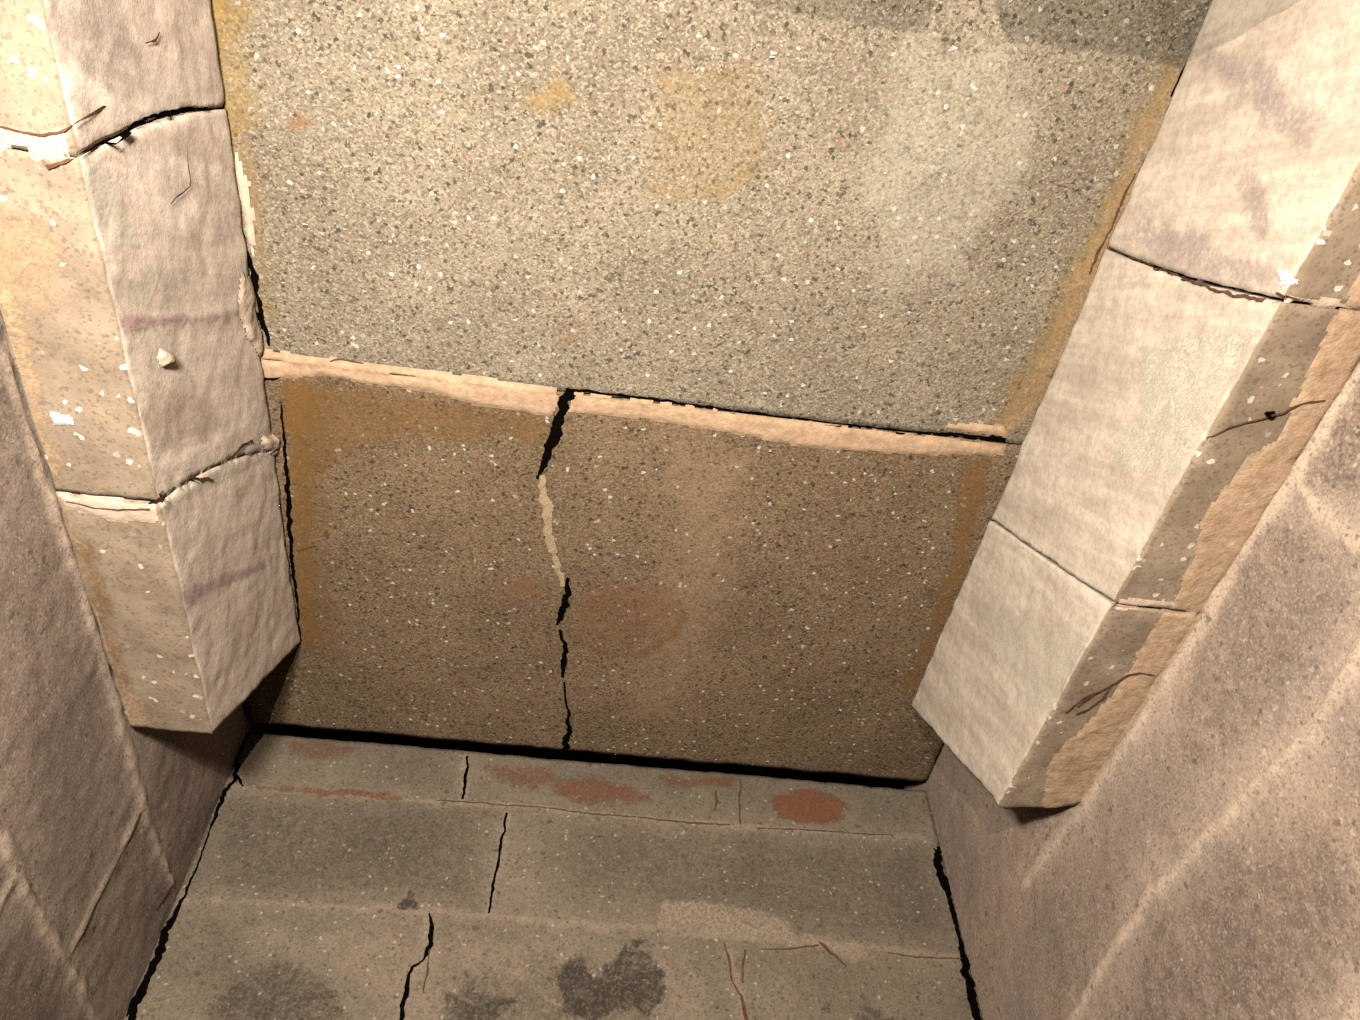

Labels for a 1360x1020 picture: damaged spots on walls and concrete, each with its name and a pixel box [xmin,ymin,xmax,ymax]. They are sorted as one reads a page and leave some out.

crack [0,106,208,170]
crack [171,146,191,204]
crack [1170,63,1186,97]
crack [1089,173,1300,302]
crack [536,388,1006,753]
rust [773,789,845,823]
crack [70,815,142,962]
crack [126,763,244,1020]
crack [399,913,434,1020]
crack [887,846,982,1020]